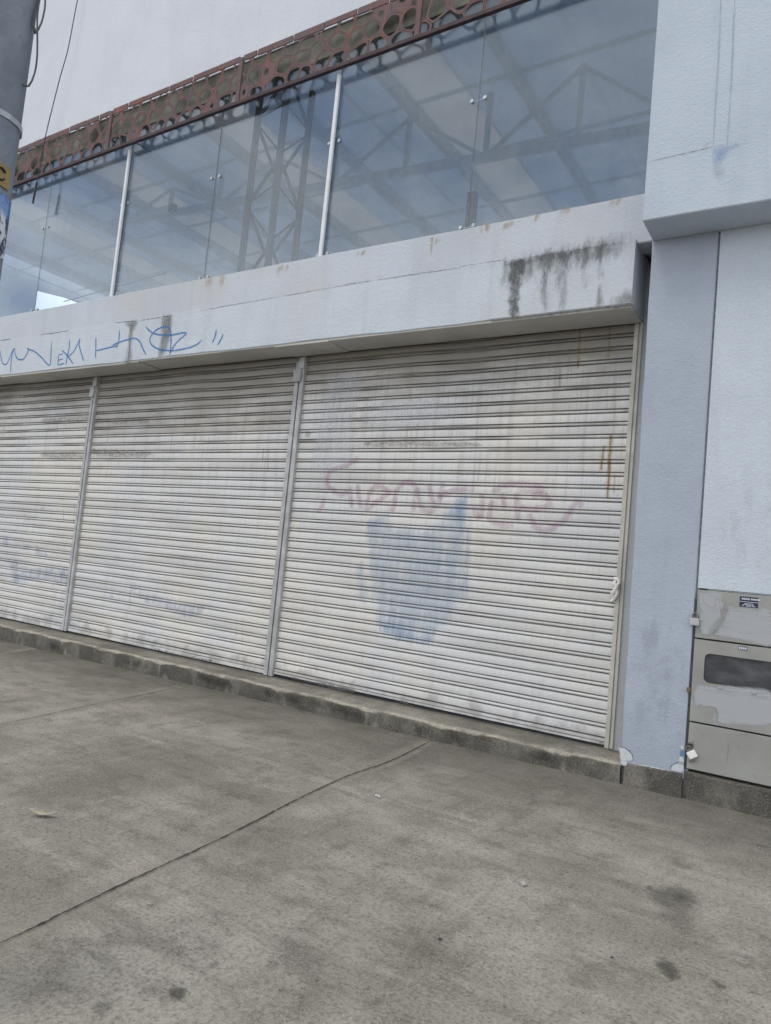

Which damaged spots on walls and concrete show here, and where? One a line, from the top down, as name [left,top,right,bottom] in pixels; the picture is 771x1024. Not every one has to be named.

damp [508,242,609,318]
peeling [619,745,684,772]